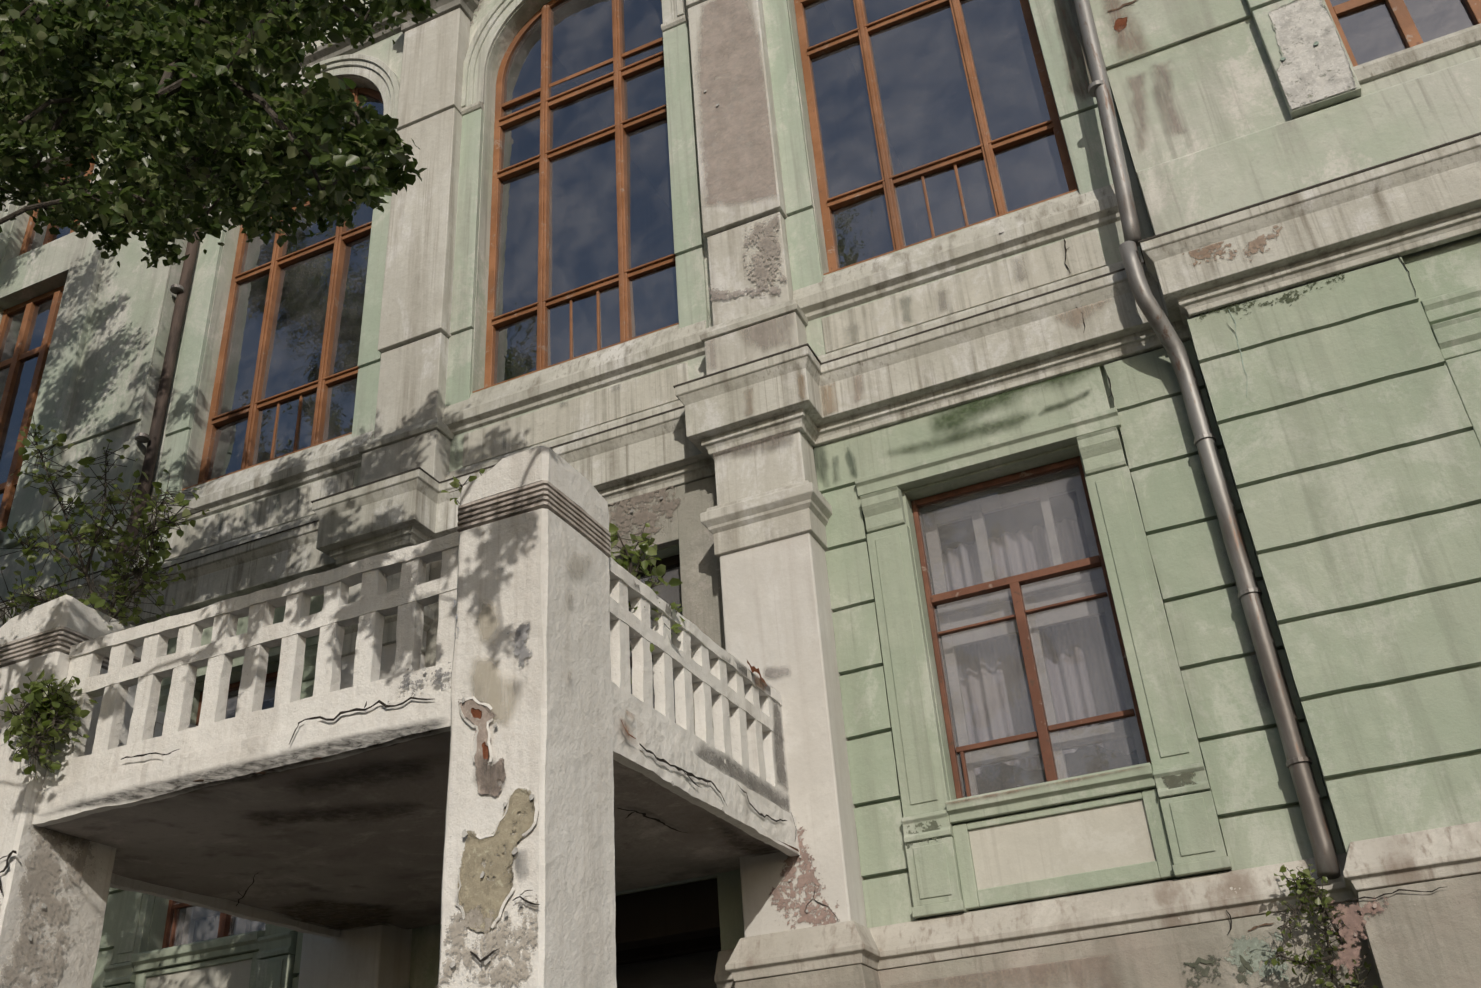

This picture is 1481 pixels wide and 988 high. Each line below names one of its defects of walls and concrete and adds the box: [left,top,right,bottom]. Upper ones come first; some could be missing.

rust [1114,17,1127,32]
mould [904,370,1081,451]
spalling [59,720,442,811]
crack [289,697,433,744]
peeling [388,662,539,988]
crack [618,808,686,833]
crack [639,743,796,840]
peeling [0,826,95,988]
peeling [727,822,840,929]